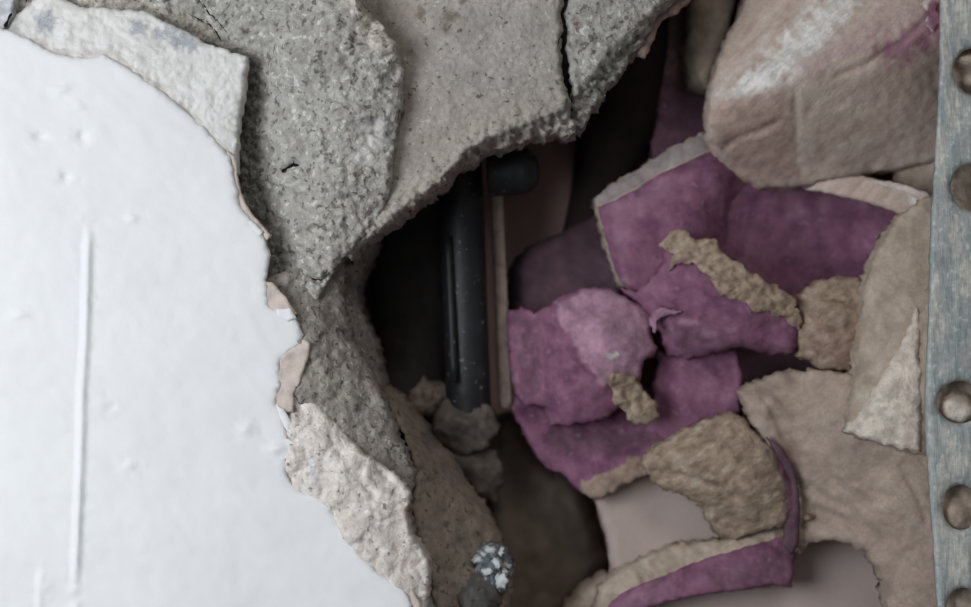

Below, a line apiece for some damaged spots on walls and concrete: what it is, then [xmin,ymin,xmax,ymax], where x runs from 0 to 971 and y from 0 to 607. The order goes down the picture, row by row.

crack [189,0,228,41]
crack [557,0,574,111]
spalling [0,0,577,607]
spalling [843,307,922,452]